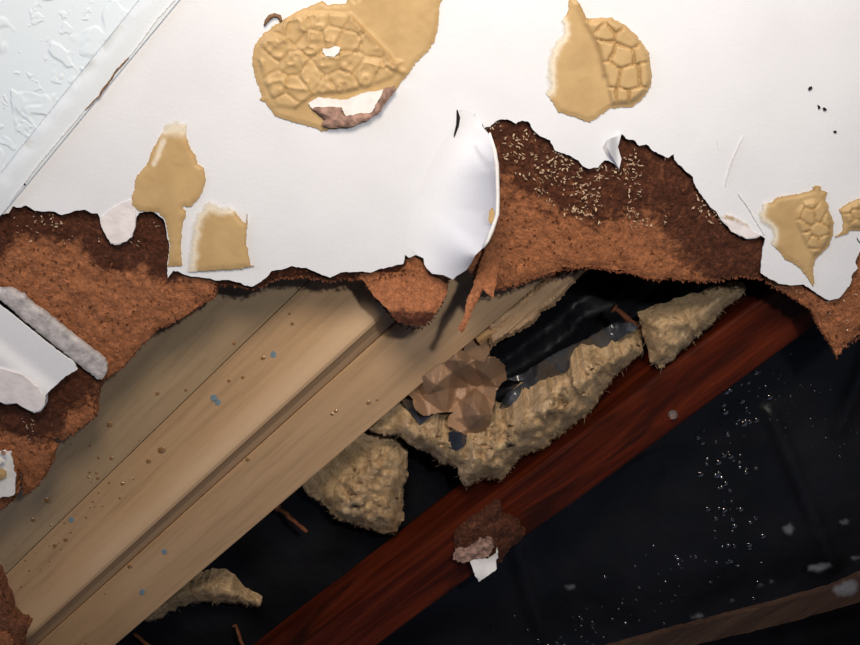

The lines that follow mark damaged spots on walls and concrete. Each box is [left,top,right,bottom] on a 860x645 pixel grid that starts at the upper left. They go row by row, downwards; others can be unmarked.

spalling [0,109,860,510]
peeling [453,536,498,582]
spalling [0,565,33,645]